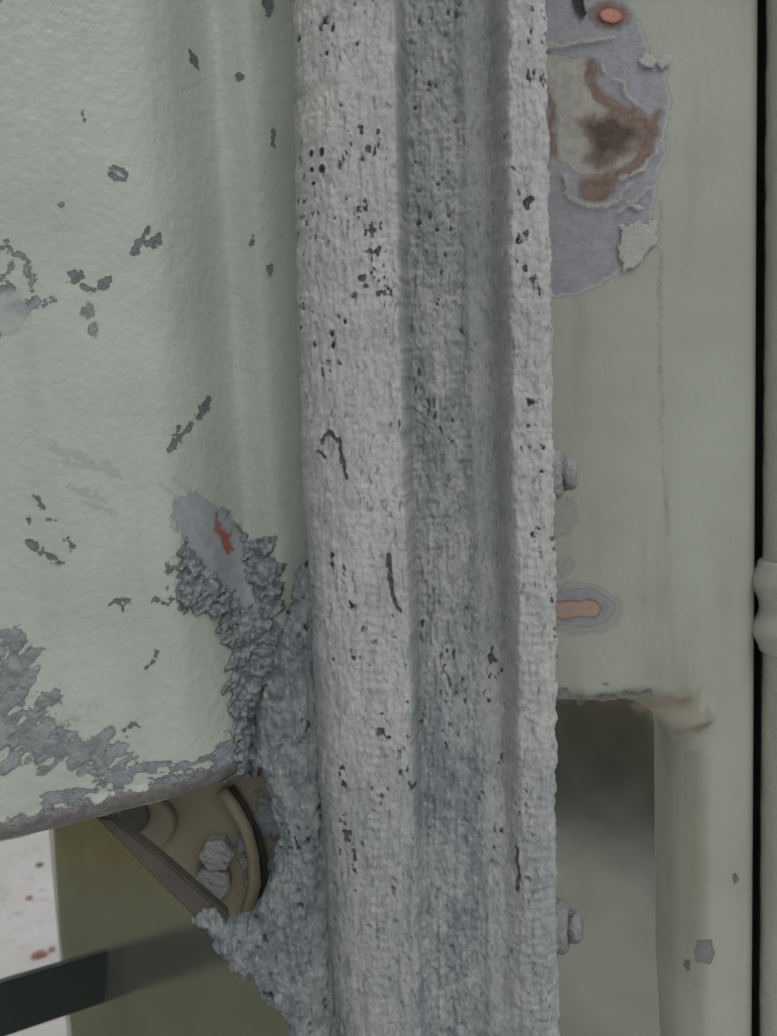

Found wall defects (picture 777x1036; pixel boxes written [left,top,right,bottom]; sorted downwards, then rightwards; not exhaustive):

rust [545,0,673,297]
peeling [0,239,58,336]
rust [555,581,621,633]
peeling [0,477,288,879]
peeling [684,939,715,970]